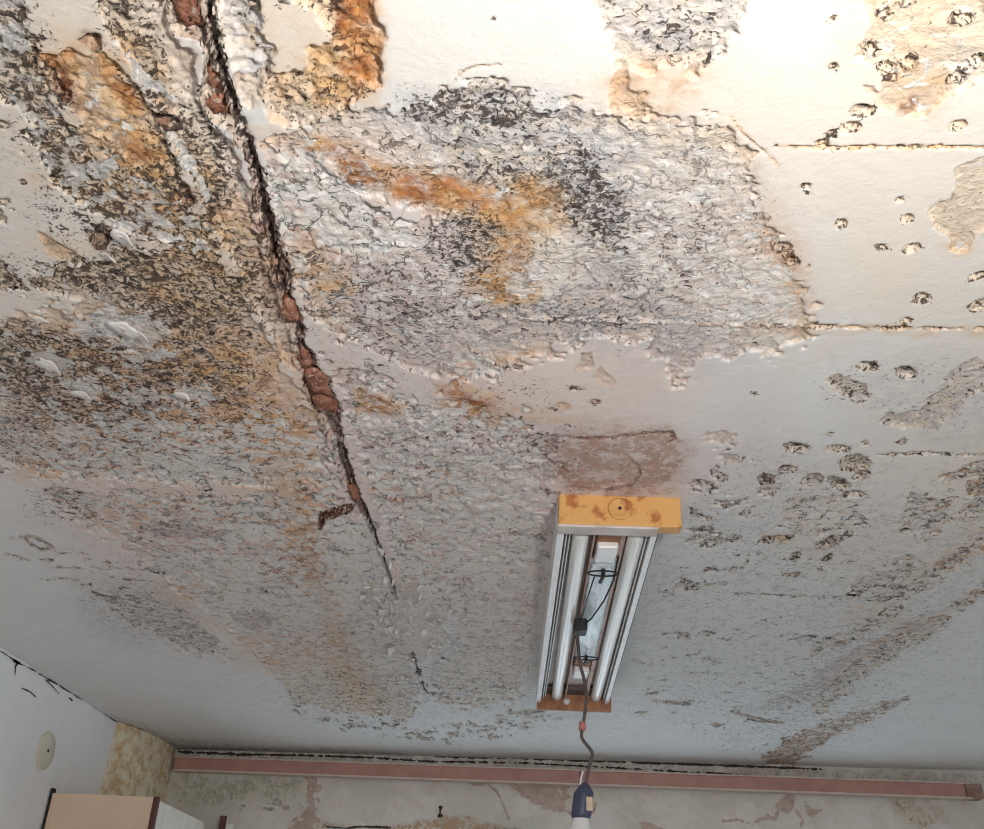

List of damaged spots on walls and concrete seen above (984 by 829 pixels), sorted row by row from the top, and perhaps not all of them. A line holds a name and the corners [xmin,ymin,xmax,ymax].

peeling [814,0,984,146]
crack [773,141,984,151]
peeling [927,156,984,253]
crack [162,0,428,599]
flaking render [0,0,823,745]
crack [699,322,984,331]
flaking render [879,357,984,445]
damp [559,433,679,494]
flaking render [654,430,873,597]
damp [90,584,234,659]
peeling [631,460,984,766]
crack [1,651,117,722]